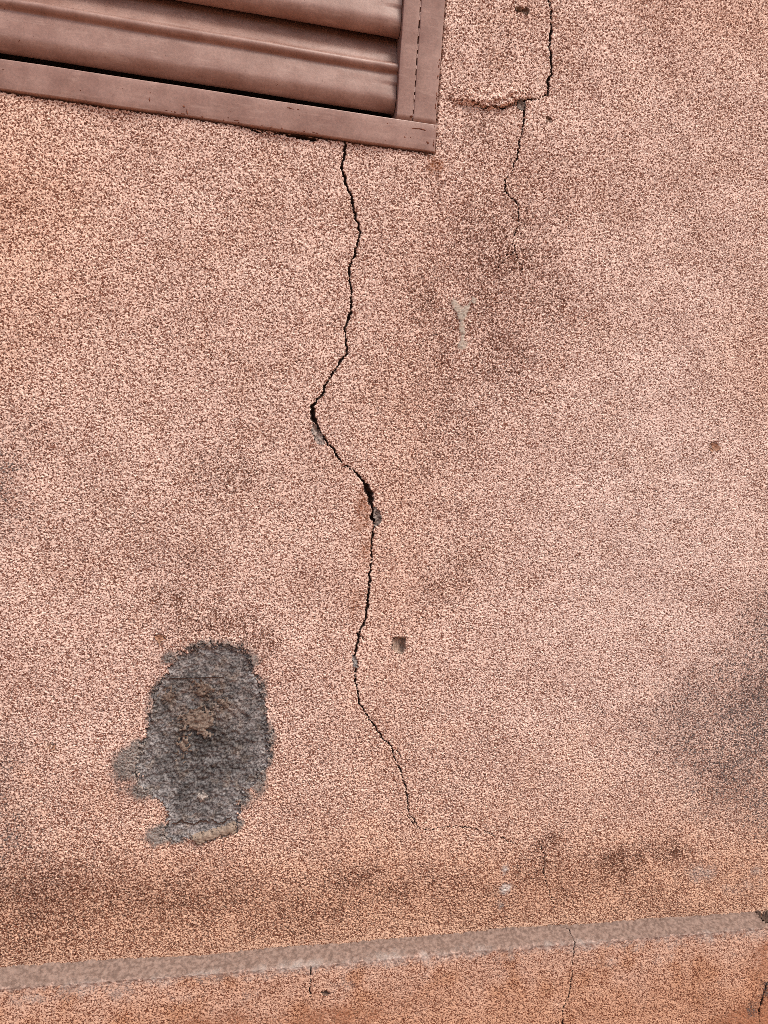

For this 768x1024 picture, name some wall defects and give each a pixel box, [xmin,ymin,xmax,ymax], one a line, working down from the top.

crack [473,0,553,270]
crack [310,142,513,843]
spalling [112,641,276,847]